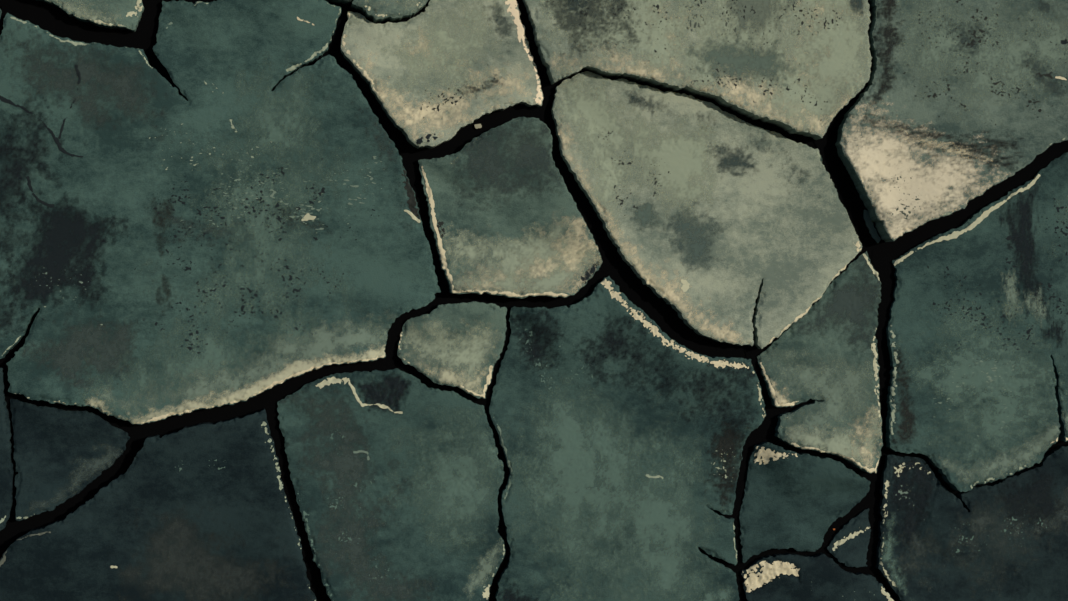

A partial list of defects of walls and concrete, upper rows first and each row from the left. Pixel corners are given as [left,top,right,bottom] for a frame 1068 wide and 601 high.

crack [0,0,778,601]
crack [600,75,1068,601]